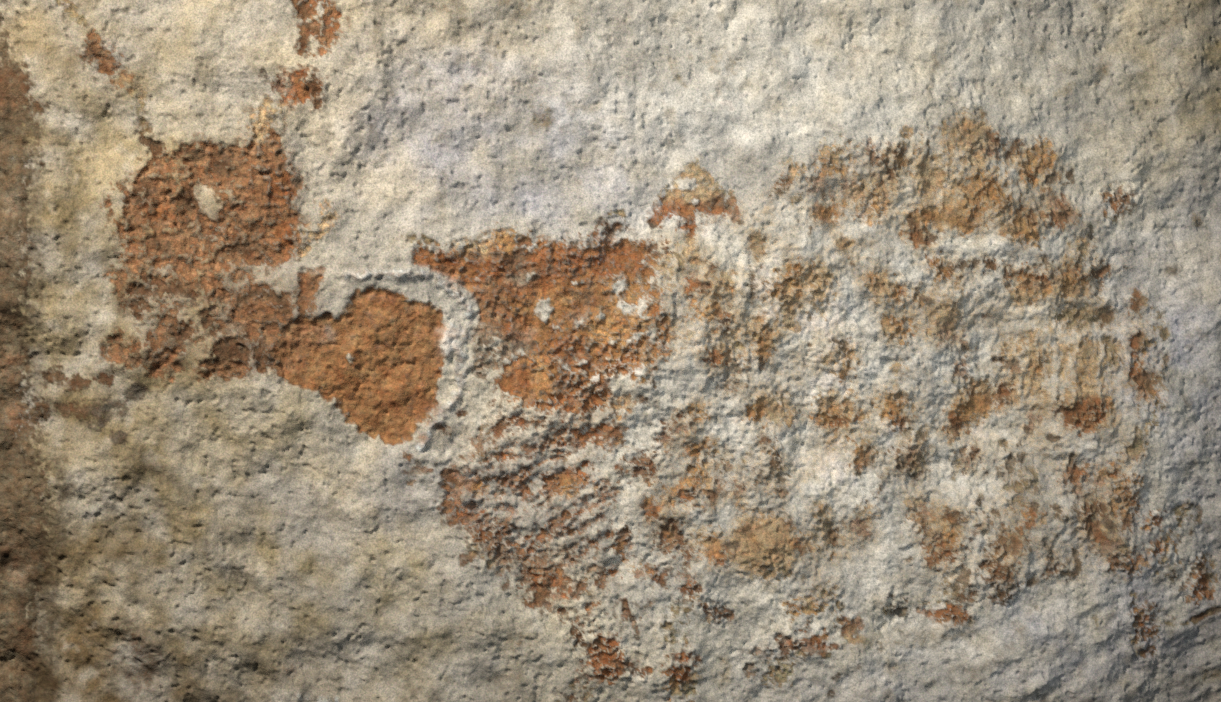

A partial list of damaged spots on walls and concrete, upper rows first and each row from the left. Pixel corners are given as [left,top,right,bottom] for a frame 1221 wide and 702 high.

corrosion [253,0,342,141]
corrosion [1102,185,1137,222]
spalling [0,12,930,702]
corrosion [1119,289,1169,416]
corrosion [1024,386,1115,442]
corrosion [1178,554,1218,605]
corrosion [1130,593,1160,658]